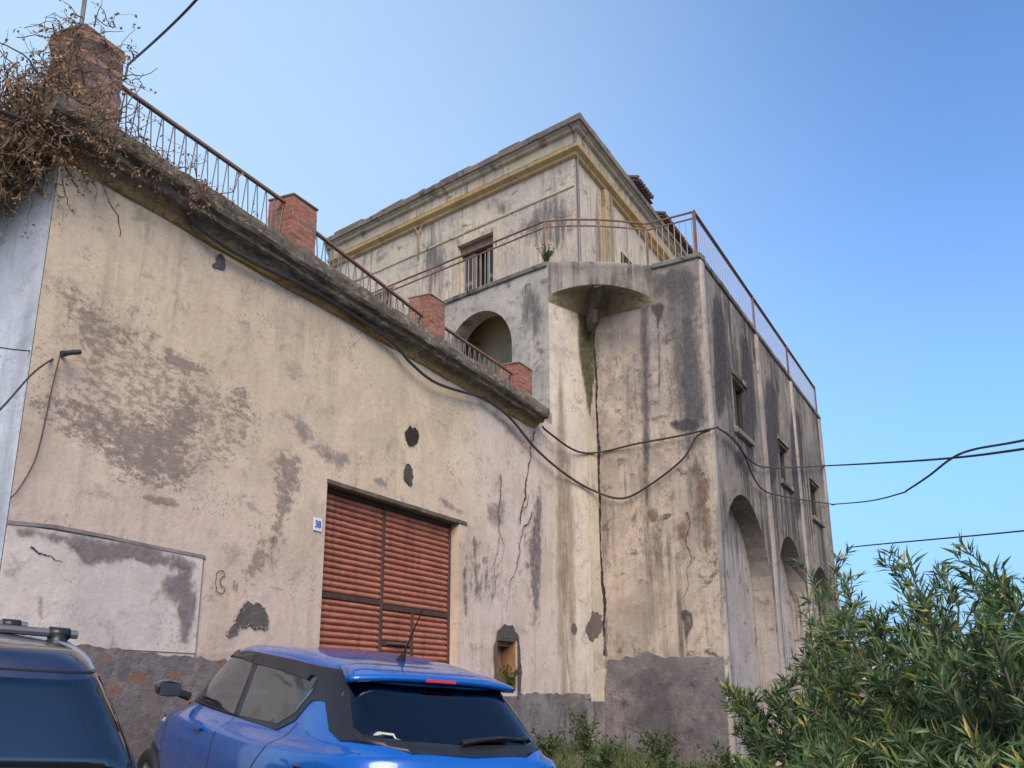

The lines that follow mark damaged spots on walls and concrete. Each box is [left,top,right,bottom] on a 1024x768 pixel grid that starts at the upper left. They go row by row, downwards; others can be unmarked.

spalling [212,254,226,270]
spalling [404,463,414,486]
crack [493,430,536,611]
damp [578,314,595,414]
crack [593,331,607,656]
damp [641,270,728,522]
damp [735,338,804,521]
damp [18,529,196,642]
spalling [226,600,270,637]
spalling [571,611,608,668]